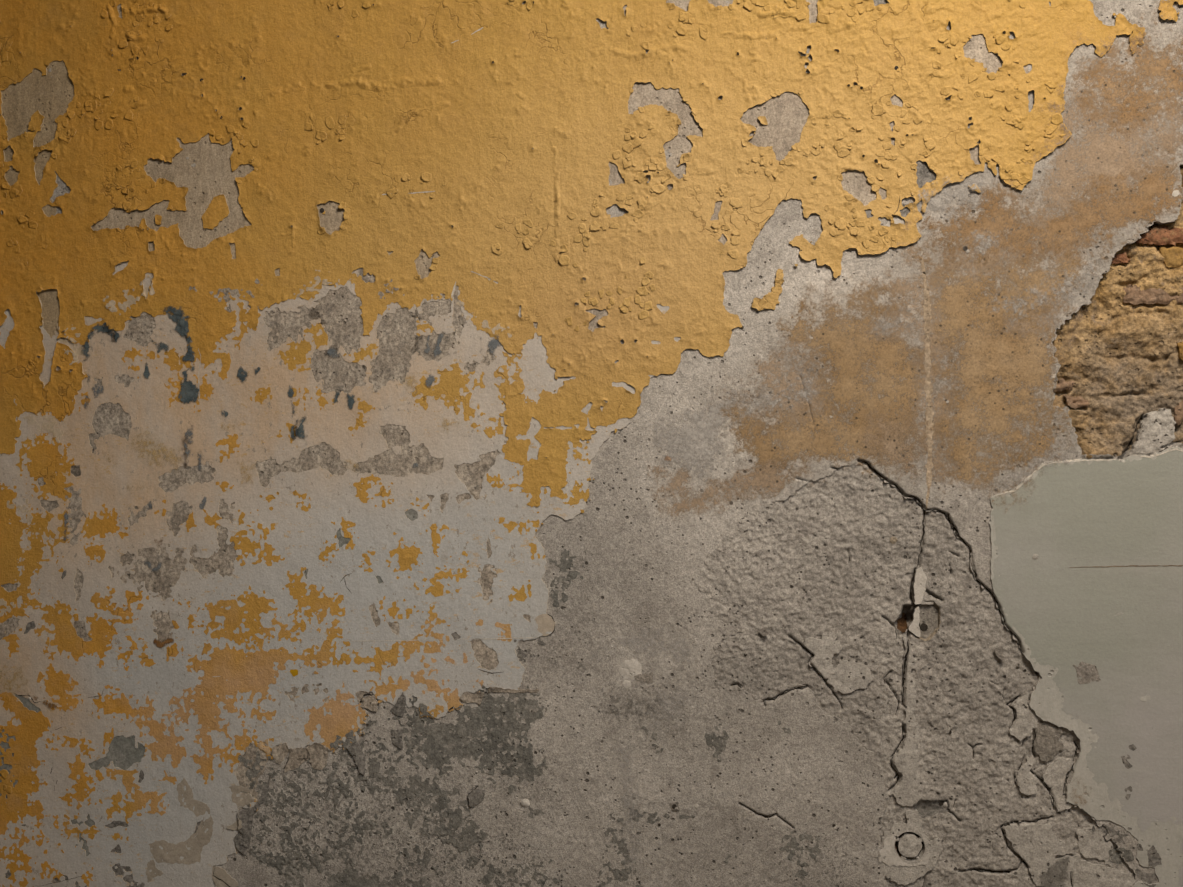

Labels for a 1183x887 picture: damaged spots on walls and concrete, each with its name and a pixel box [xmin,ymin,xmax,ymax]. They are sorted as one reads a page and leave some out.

peeling [91,133,257,259]
peeling [628,82,703,190]
peeling [740,89,810,165]
peeling [263,268,512,394]
flaking render [1051,165,1183,459]
peeling [108,461,238,643]
peeling [255,424,500,513]
crack [796,459,1023,652]
peeling [227,683,566,887]
crack [733,635,842,706]
crack [882,616,909,789]
crack [958,682,1079,873]